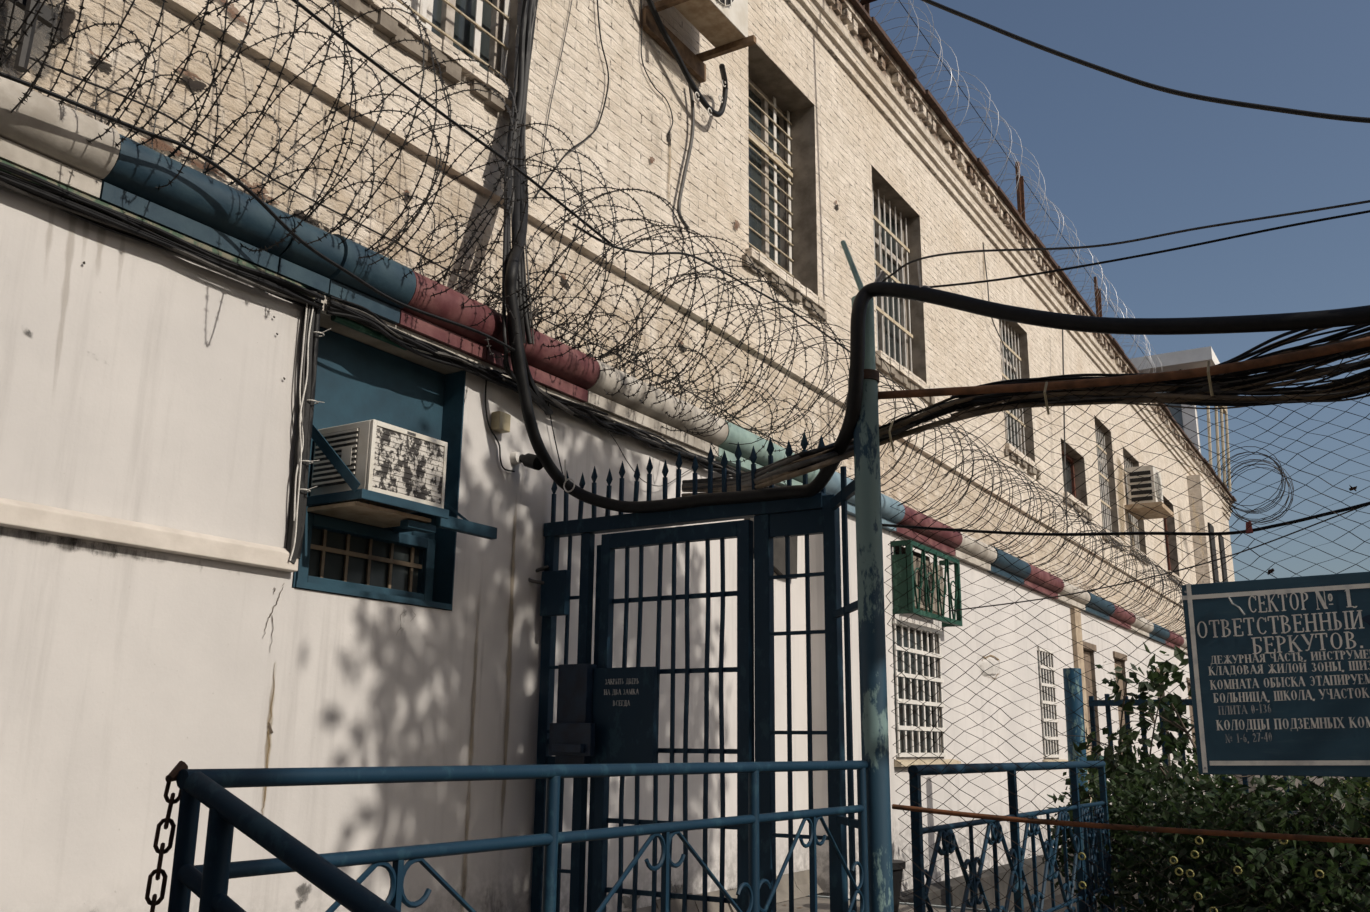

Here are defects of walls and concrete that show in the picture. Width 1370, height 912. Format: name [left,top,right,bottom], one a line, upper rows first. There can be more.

leakage [1,530,116,556]
crack [262,584,284,815]